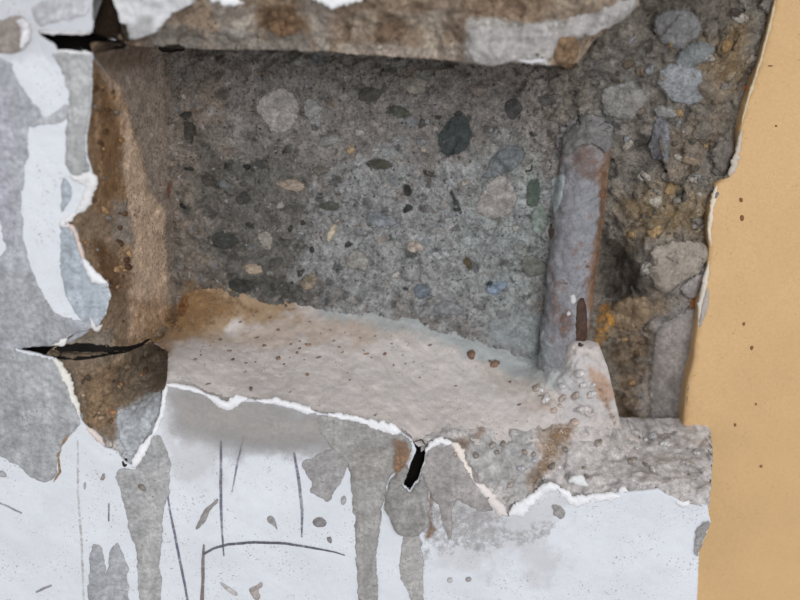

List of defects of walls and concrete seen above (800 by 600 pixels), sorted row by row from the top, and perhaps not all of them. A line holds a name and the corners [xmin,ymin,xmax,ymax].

spalling [0,16,91,54]
water stain [61,178,72,212]
water stain [60,226,110,327]
spalling [46,0,776,518]